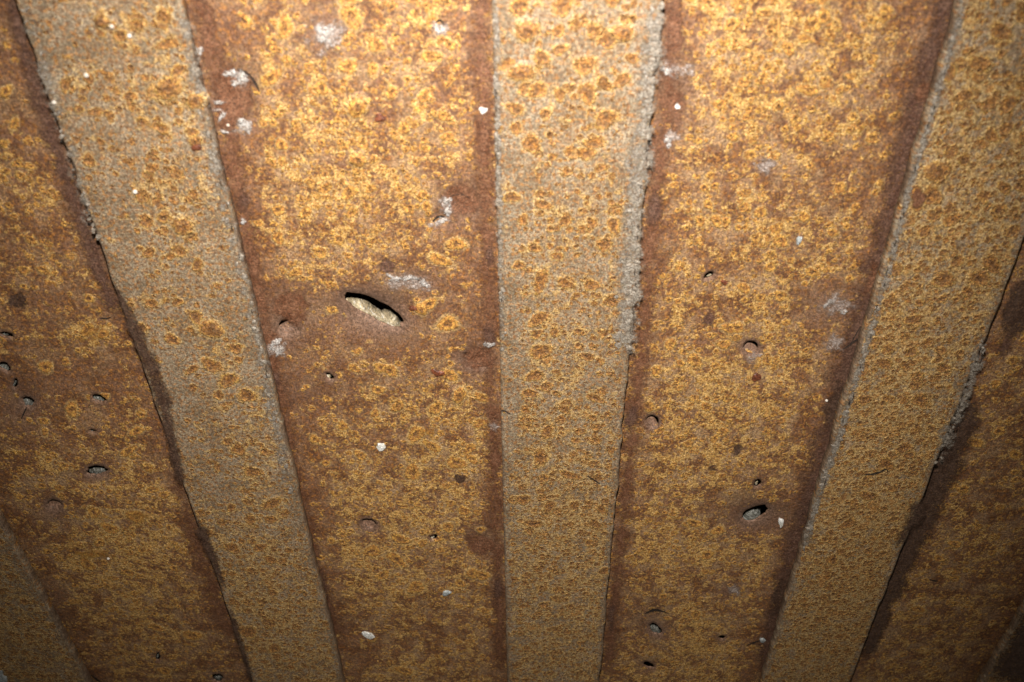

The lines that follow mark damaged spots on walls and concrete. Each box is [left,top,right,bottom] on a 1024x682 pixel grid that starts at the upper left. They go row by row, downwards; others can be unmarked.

corrosion [343,92,386,124]
corrosion [7,0,252,679]
corrosion [147,0,344,634]
spalling [345,295,402,326]
corrosion [379,258,395,273]
corrosion [409,299,432,319]
corrosion [440,0,507,670]
corrosion [604,0,685,663]
corrosion [757,0,953,669]
crack [842,327,872,369]
spalling [742,506,761,520]
corrosion [863,402,980,659]